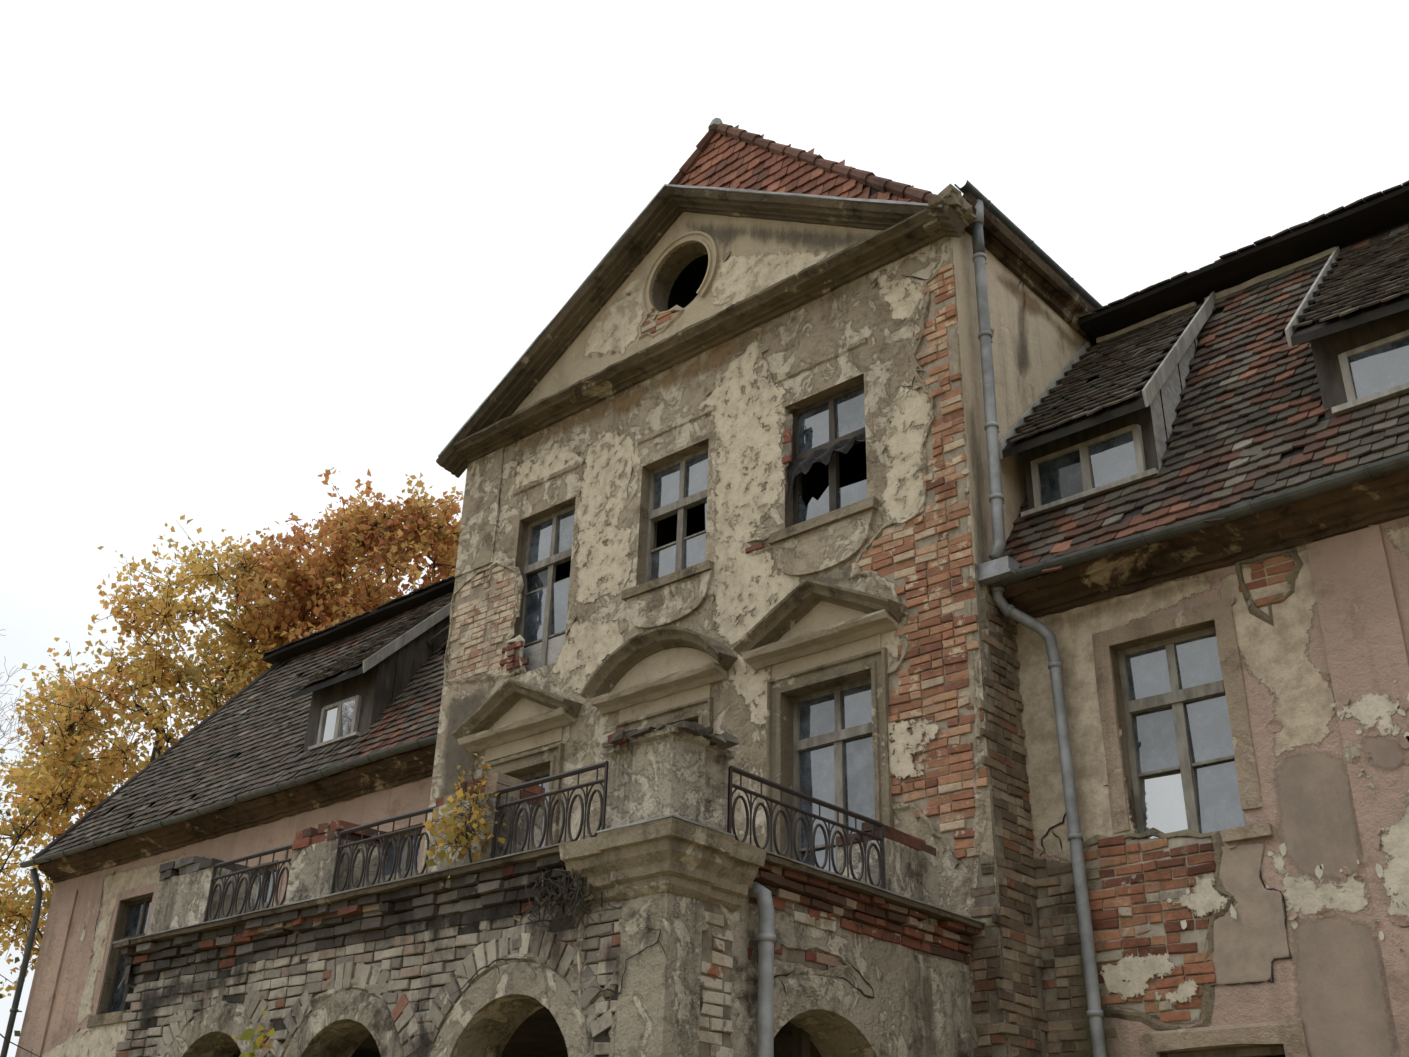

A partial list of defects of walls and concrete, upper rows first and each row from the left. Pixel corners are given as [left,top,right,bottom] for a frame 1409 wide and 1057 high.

peeling [584,288,684,359]
peeling [711,248,828,307]
peeling [513,432,641,696]
peeling [696,341,804,730]
spalling [847,254,1409,1057]
spalling [41,850,622,1057]